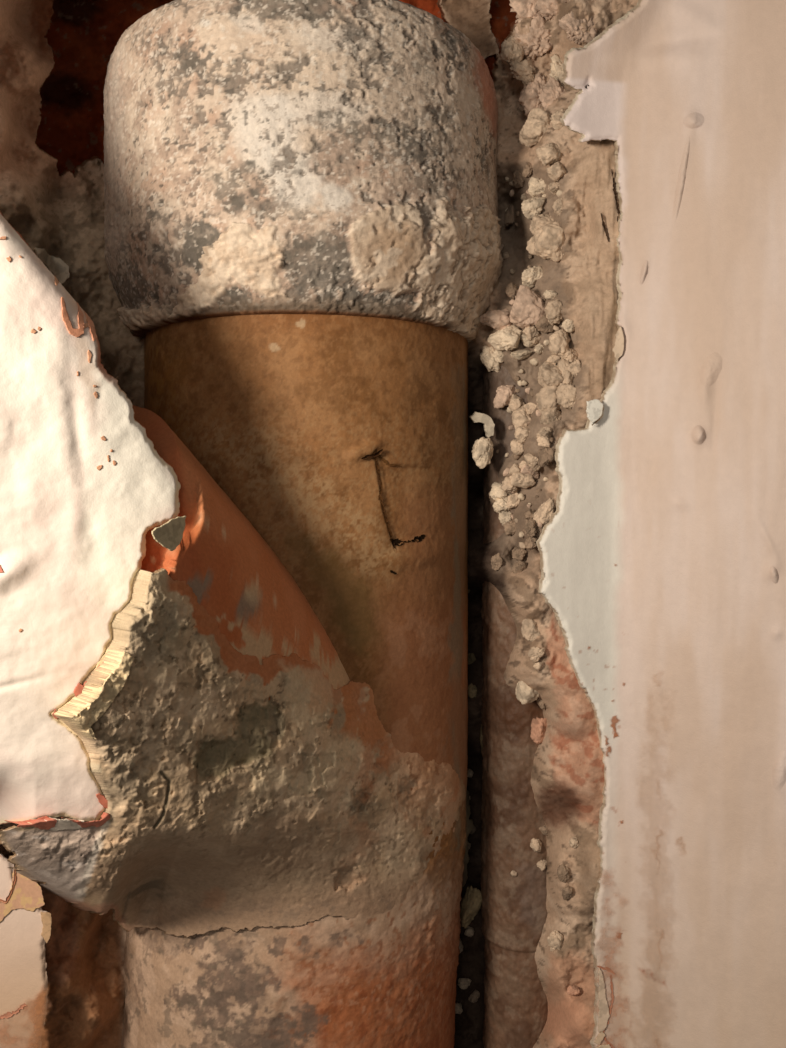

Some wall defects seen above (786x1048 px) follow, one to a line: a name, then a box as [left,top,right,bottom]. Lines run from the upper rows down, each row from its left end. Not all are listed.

flaking render [399,0,443,20]
flaking render [485,0,517,80]
flaking render [35,0,174,174]
spalling [34,247,70,284]
spalling [612,326,624,361]
peeling [0,869,52,943]
peeling [594,968,611,1048]